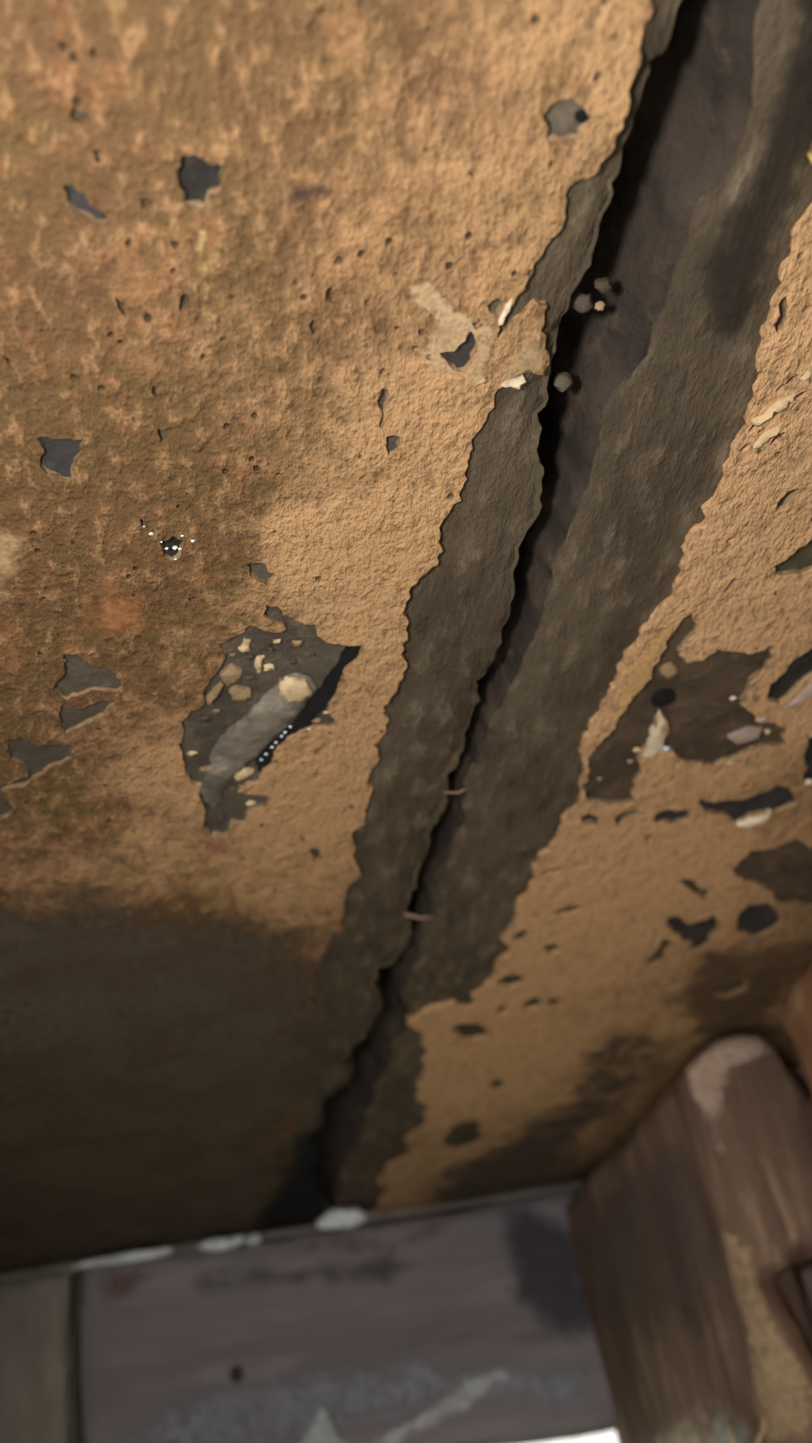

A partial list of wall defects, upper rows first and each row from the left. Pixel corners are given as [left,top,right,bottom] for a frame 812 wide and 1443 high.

spalling [177,155,223,207]
damp [292,186,327,200]
peeling [179,294,190,309]
spalling [248,563,276,584]
crack [308,0,761,1215]
spalling [262,0,812,1212]
spalling [179,605,363,836]